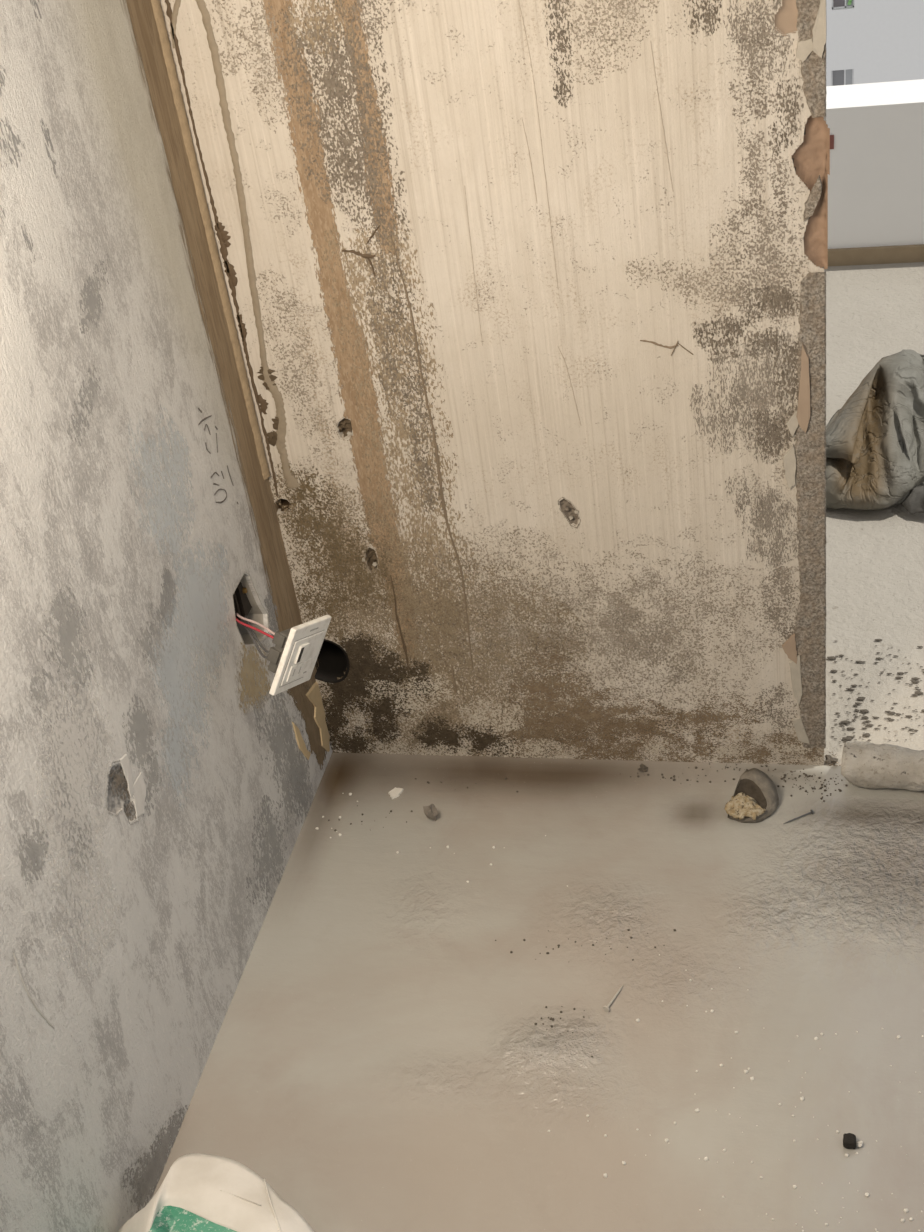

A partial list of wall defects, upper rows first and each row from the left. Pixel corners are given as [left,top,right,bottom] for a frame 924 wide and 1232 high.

damp [126,0,840,766]
spalling [434,0,834,749]
peeling [19,819,49,886]
spalling [106,694,162,825]